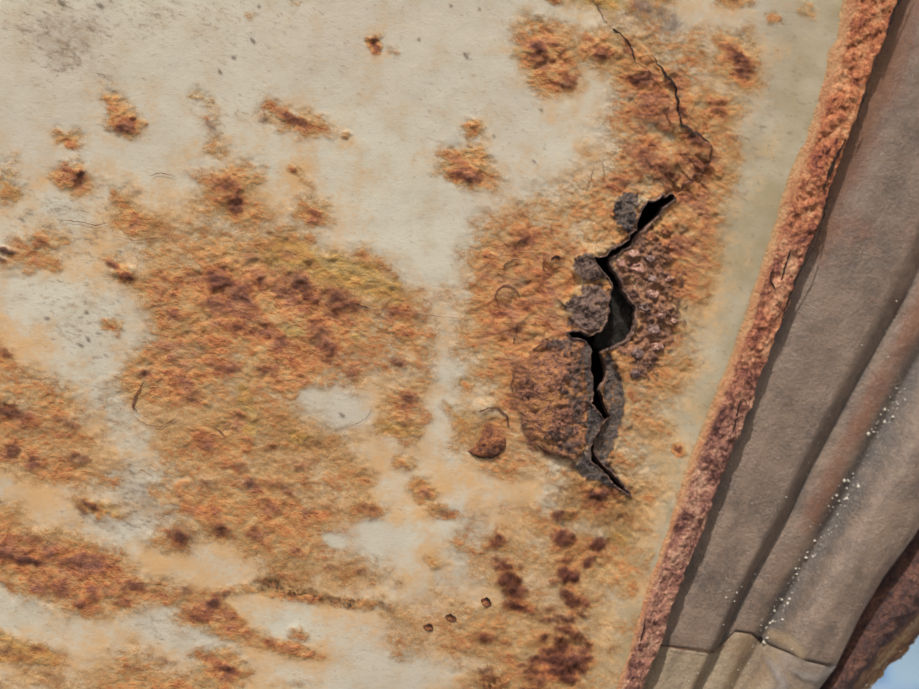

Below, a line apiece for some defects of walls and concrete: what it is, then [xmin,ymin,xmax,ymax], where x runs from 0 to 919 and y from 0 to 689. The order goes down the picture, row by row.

rust [365,35,383,55]
crack [886,0,901,35]
rust [52,129,82,150]
rust [100,93,147,140]
rust [261,99,330,138]
rust [838,0,903,180]
crack [495,236,529,303]
crack [513,0,713,497]
crack [769,140,846,322]
rust [380,0,763,689]
rust [0,160,439,660]
rust [0,629,80,689]